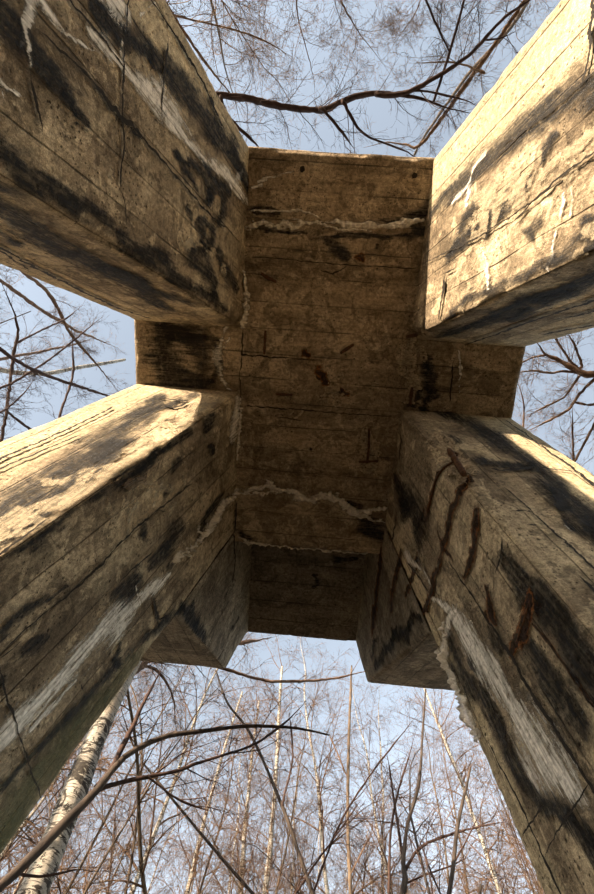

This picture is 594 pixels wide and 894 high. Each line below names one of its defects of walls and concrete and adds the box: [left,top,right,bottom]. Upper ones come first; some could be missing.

crack [30,71,43,134]
crack [41,0,225,227]
leakage [0,0,594,338]
leakage [0,322,244,572]
leakage [0,479,387,795]
leakage [371,610,425,670]
corrosion [420,448,474,616]
corrosion [462,507,480,580]
leakage [393,473,594,870]
leakage [407,353,594,541]
corrosion [509,589,594,707]